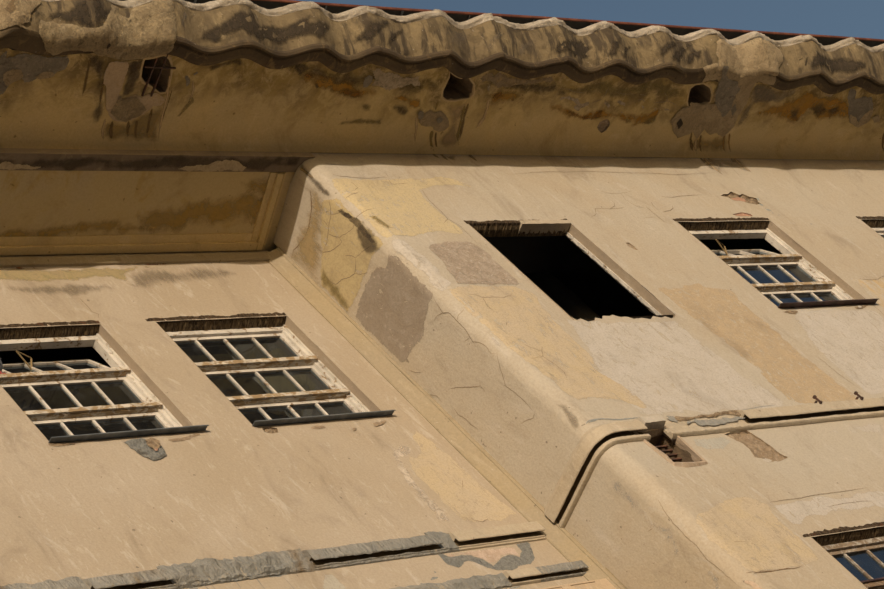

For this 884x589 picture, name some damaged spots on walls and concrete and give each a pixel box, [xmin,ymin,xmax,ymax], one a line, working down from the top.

spalling [0,0,177,122]
spalling [418,71,475,132]
spalling [671,38,783,139]
leakage [31,156,328,268]
crack [291,175,405,285]
spalling [721,192,773,216]
leakage [322,274,345,305]
crack [435,301,534,424]
spalling [125,434,200,461]
spalling [723,431,788,462]
spalling [447,547,519,563]